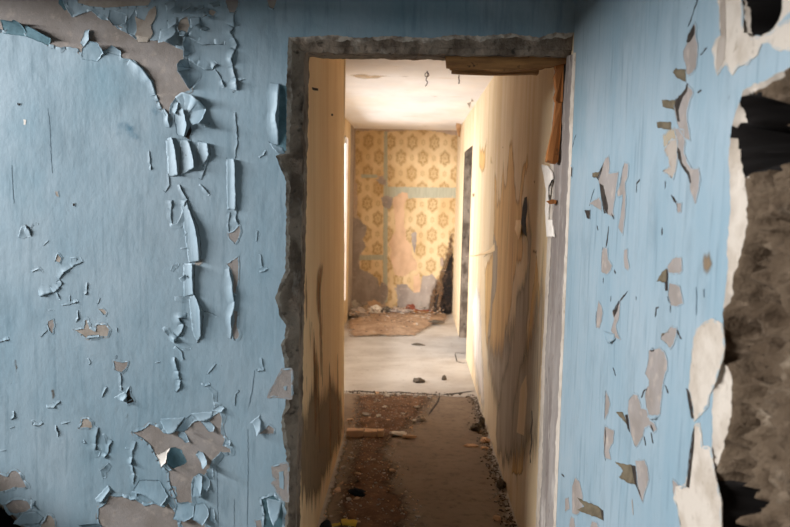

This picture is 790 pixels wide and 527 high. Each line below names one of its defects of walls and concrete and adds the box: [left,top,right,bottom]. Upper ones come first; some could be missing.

peeling [0,0,240,141]
spalling [657,0,790,204]
peeling [162,255,242,361]
peeling [225,112,242,245]
spalling [250,32,604,527]
water stain [429,235,453,315]
peeling [584,156,640,281]
peeling [656,256,684,312]
spalling [672,68,790,527]
peeling [78,405,235,527]
water stain [301,266,342,503]
peeling [603,325,682,513]